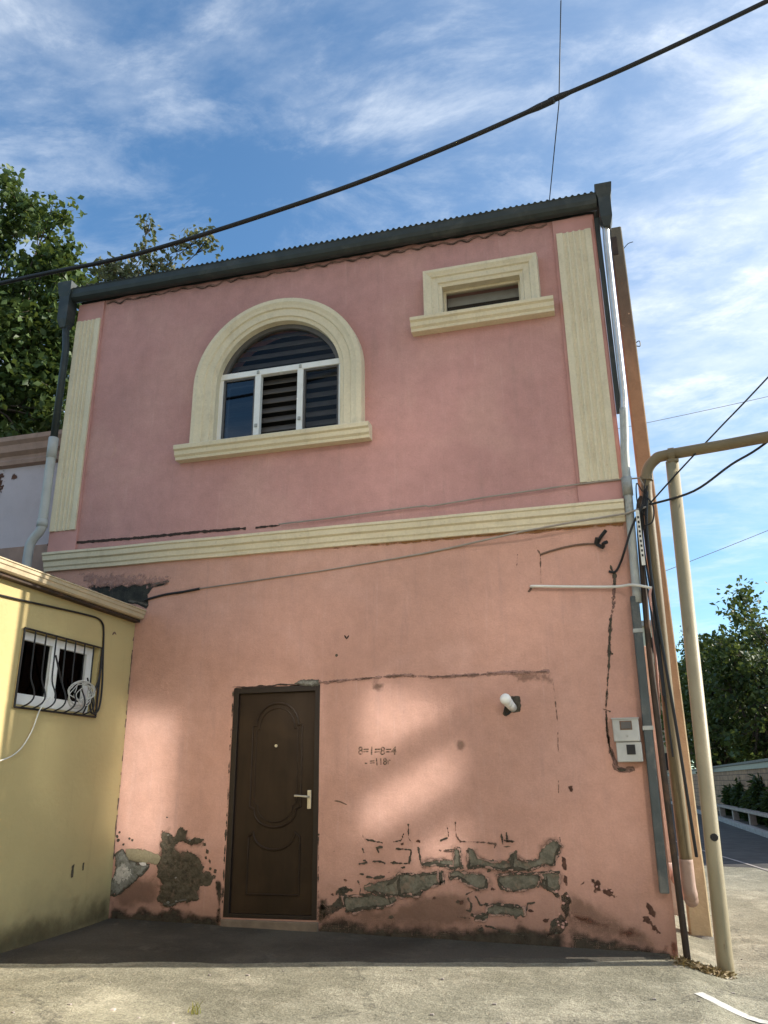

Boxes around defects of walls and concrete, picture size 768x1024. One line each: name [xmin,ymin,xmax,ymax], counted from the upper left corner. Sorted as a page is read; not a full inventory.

crack [77,525,280,544]
spalling [84,573,169,608]
crack [604,565,635,773]
crack [222,671,547,903]
spalling [110,827,222,922]
spalling [319,839,571,935]
peeling [643,903,661,934]